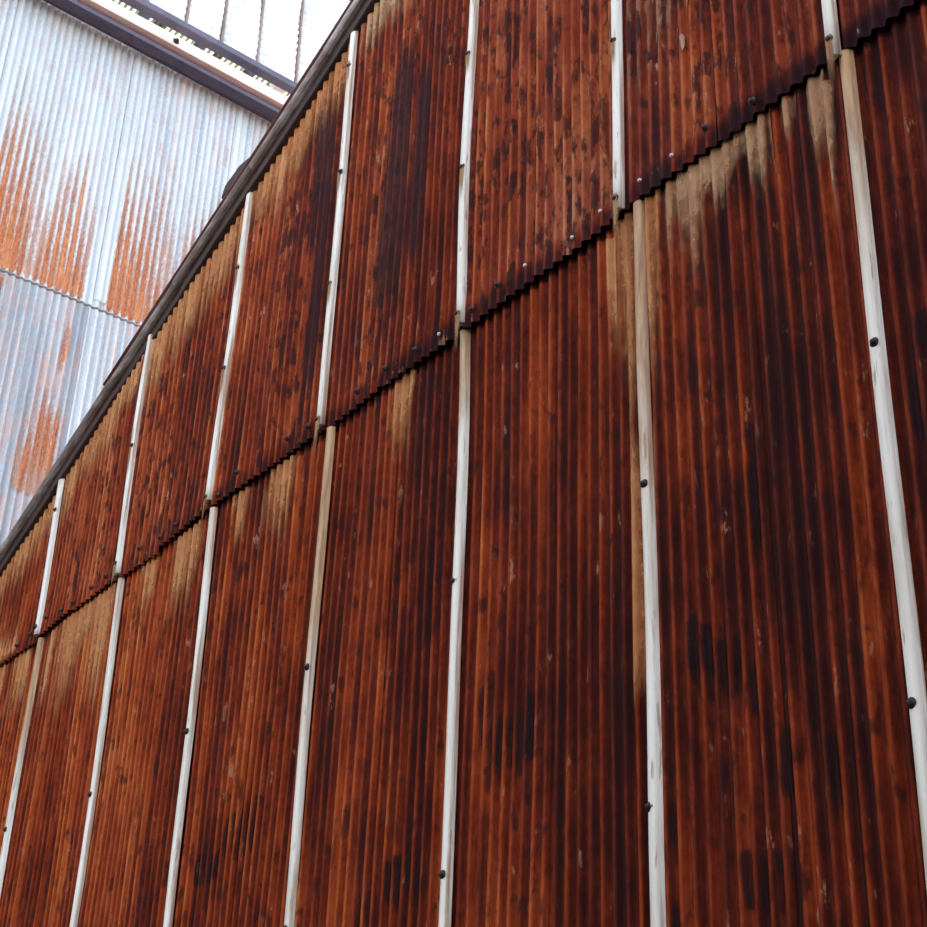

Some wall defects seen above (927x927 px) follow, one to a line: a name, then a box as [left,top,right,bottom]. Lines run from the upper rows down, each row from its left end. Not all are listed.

damp [360,0,395,48]
rust [0,126,94,299]
rust [103,187,173,323]
damp [255,43,350,388]
damp [375,52,432,316]
rust [606,192,635,382]
rust [645,189,659,322]
rust [11,398,59,496]
damp [0,207,245,596]
damp [267,455,297,523]
damp [392,368,416,434]
rust [631,449,646,687]